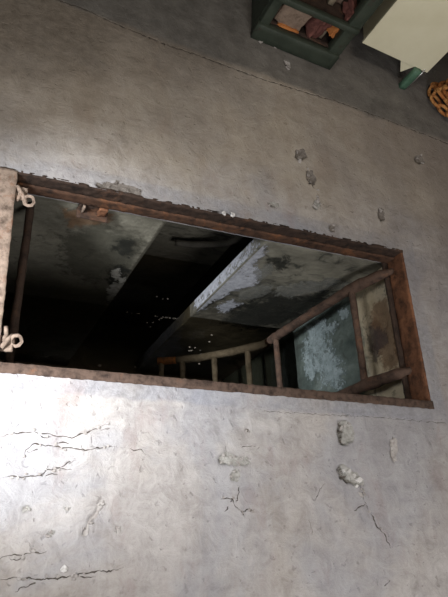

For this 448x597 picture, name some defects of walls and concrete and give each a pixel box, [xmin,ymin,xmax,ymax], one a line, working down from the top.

spalling [96,180,141,195]
water stain [194,239,337,330]
crack [0,422,147,481]
spalling [337,420,355,445]
spalling [336,464,364,488]
crack [354,484,392,549]
crack [0,548,124,593]